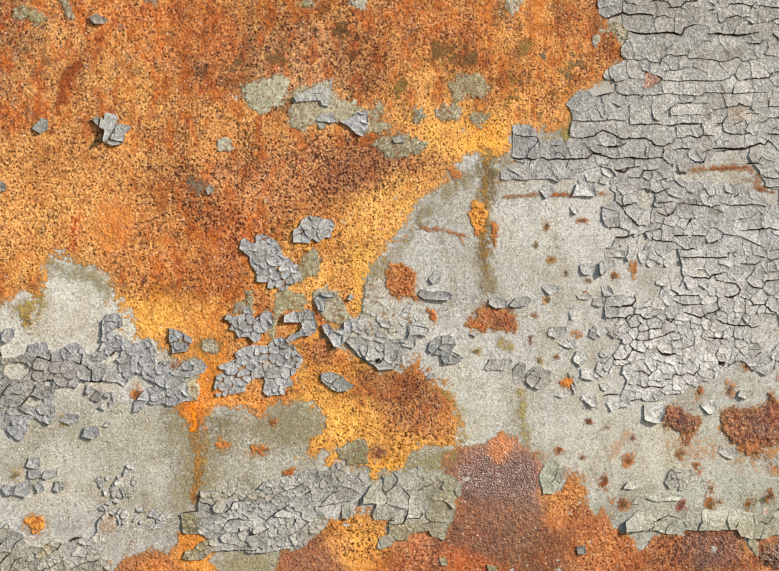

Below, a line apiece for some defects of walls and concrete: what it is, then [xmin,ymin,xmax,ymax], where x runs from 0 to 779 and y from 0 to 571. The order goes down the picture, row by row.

peeling [239,234,302,291]
peeling [293,215,335,243]
crack [500,0,779,401]
rust [691,164,775,193]
peeling [0,313,207,441]
peeling [214,292,463,397]
rust [464,301,519,350]
peeling [548,240,779,423]
rust [662,385,716,474]
rust [718,378,779,476]
rust [108,531,218,571]
peeling [0,456,462,571]